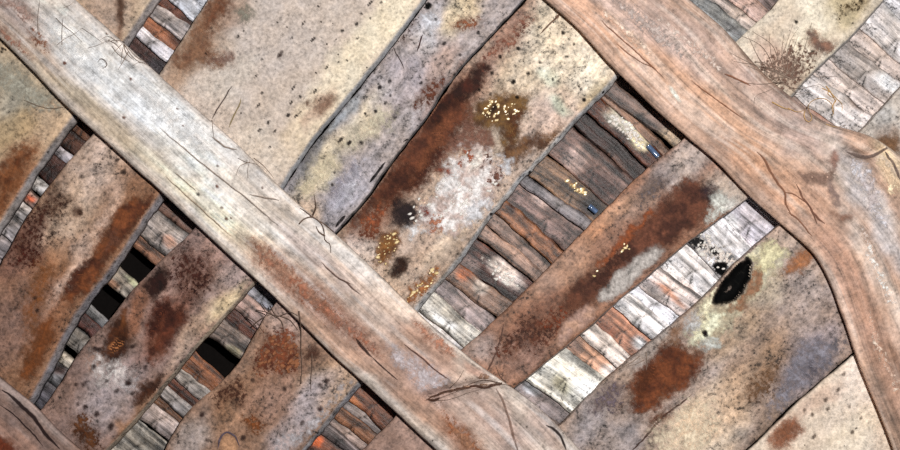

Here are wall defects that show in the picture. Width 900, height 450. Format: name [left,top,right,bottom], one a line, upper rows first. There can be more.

damp [352,14,557,237]
corrosion [65,197,152,300]
corrosion [359,202,389,239]
corrosion [564,178,715,311]
crack [759,153,824,235]
corrosion [21,321,52,379]